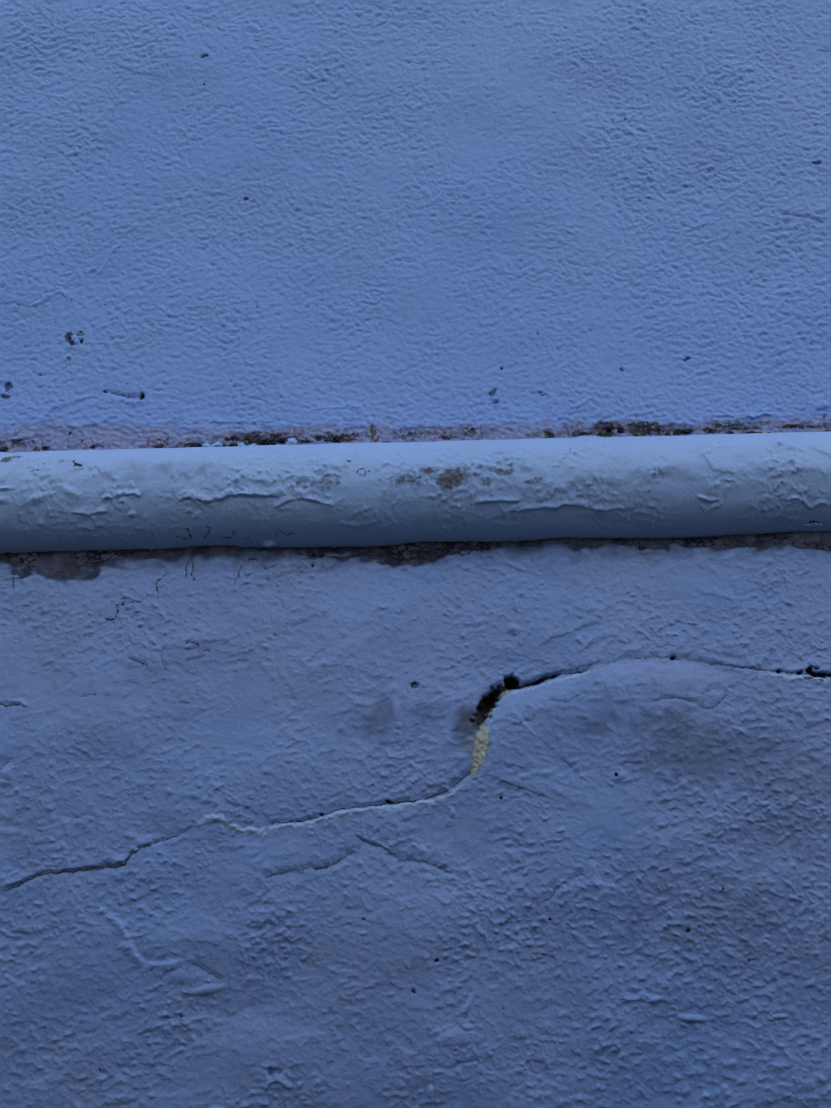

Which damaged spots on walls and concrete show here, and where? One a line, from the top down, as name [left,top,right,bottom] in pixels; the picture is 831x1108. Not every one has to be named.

crack [476,656,831,744]
crack [263,773,470,826]
crack [266,835,466,879]